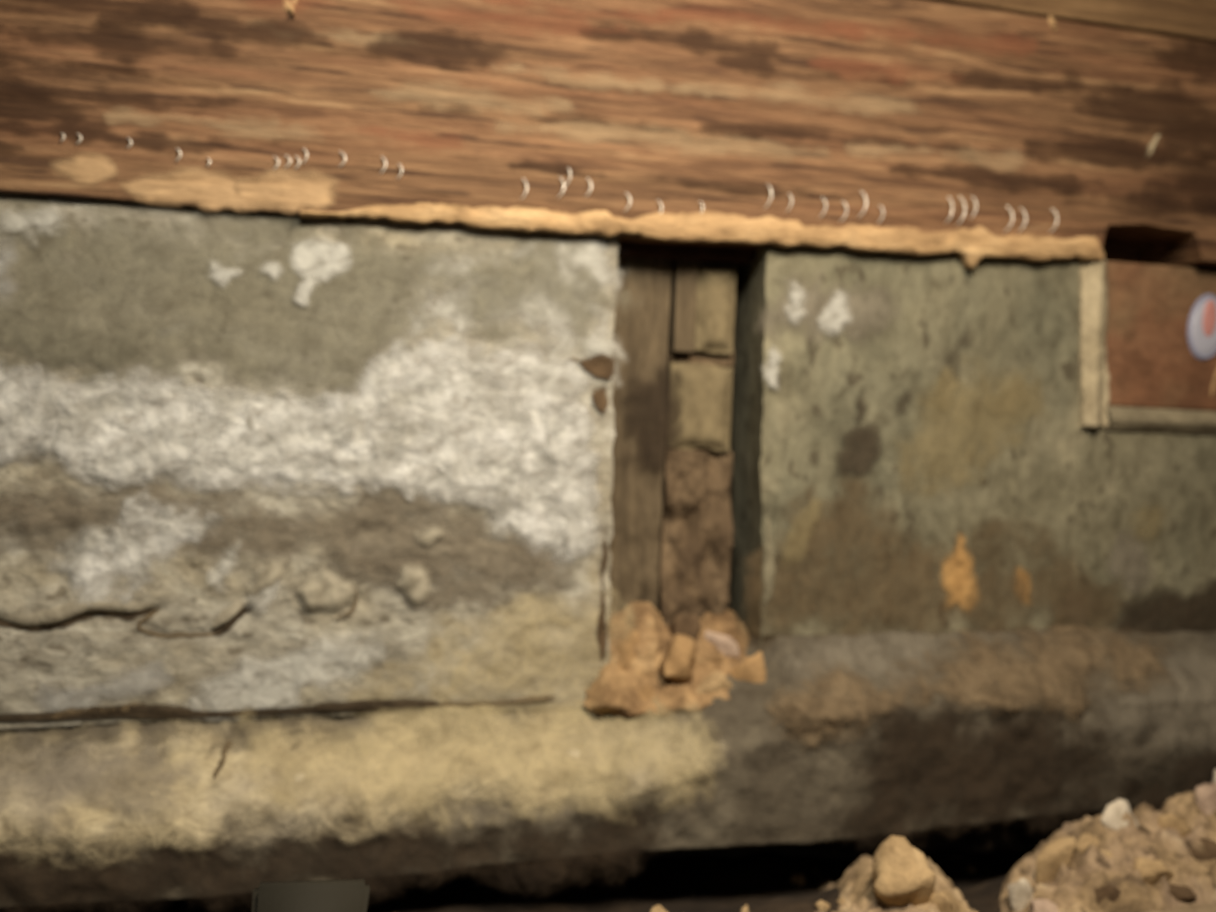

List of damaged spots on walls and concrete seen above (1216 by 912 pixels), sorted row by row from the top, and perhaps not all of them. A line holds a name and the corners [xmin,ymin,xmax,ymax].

damp [0,195,617,607]
corrosion [942,536,974,607]
crack [0,596,253,638]
damp [751,396,1216,842]
crack [0,695,556,778]